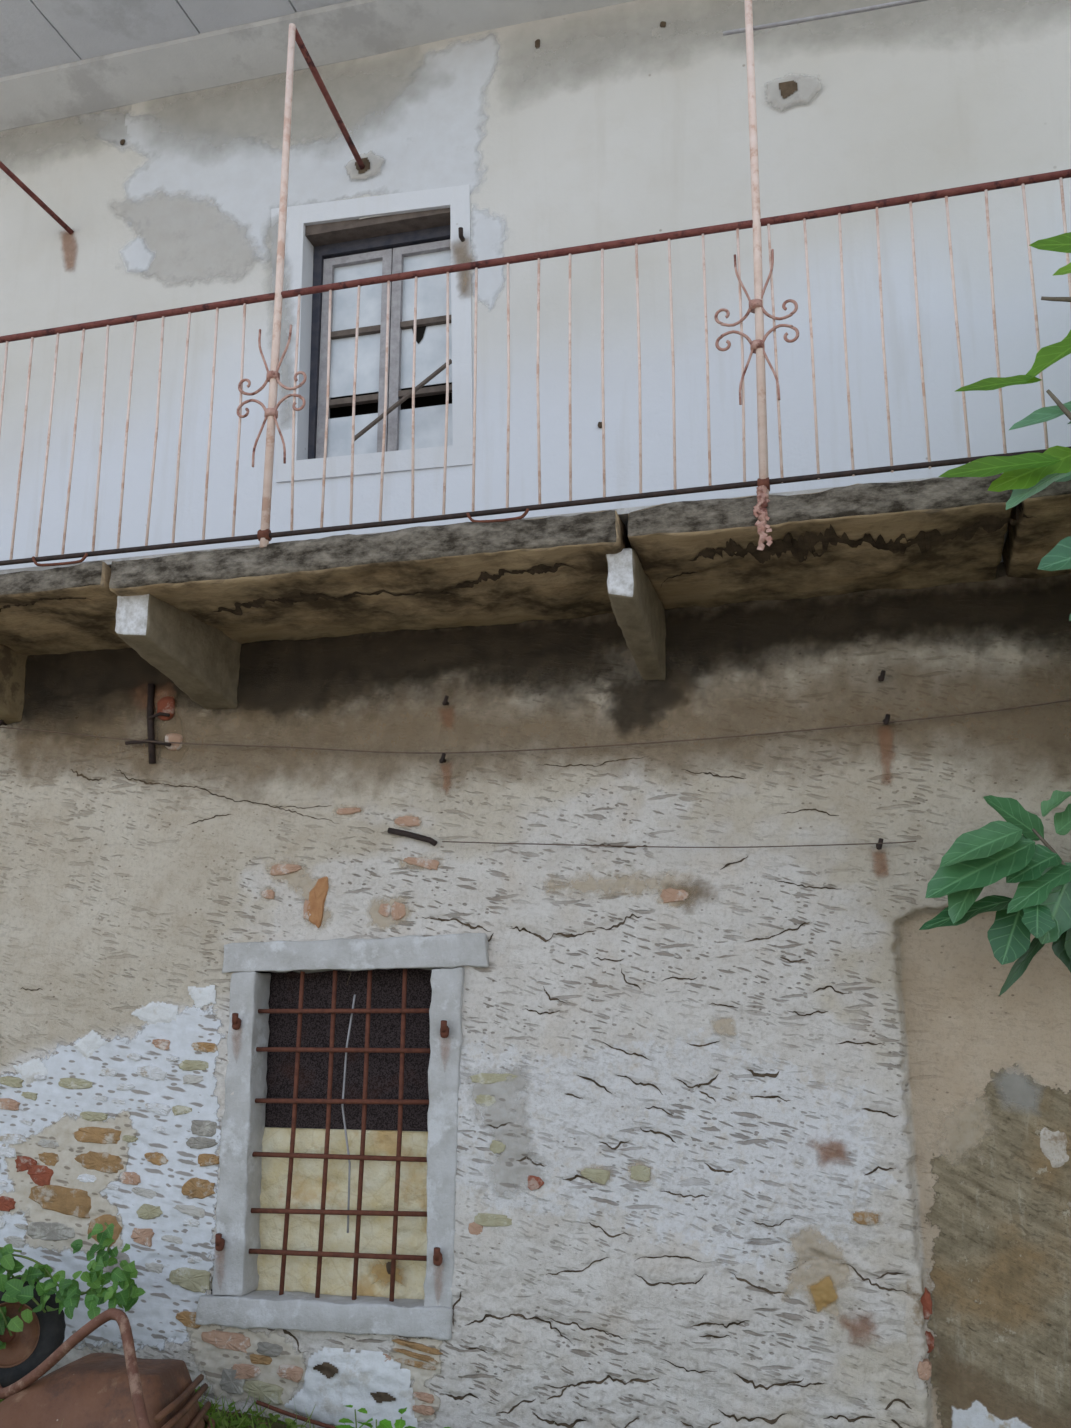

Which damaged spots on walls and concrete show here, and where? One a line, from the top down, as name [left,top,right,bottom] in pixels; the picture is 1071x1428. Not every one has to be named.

rust [63,232,75,268]
peeling [80,35,505,308]
spalling [766,74,822,111]
crack [339,563,579,601]
damp [15,579,1071,779]
crack [71,769,338,825]
peeling [0,985,307,1417]
spalling [904,1064,1071,1428]